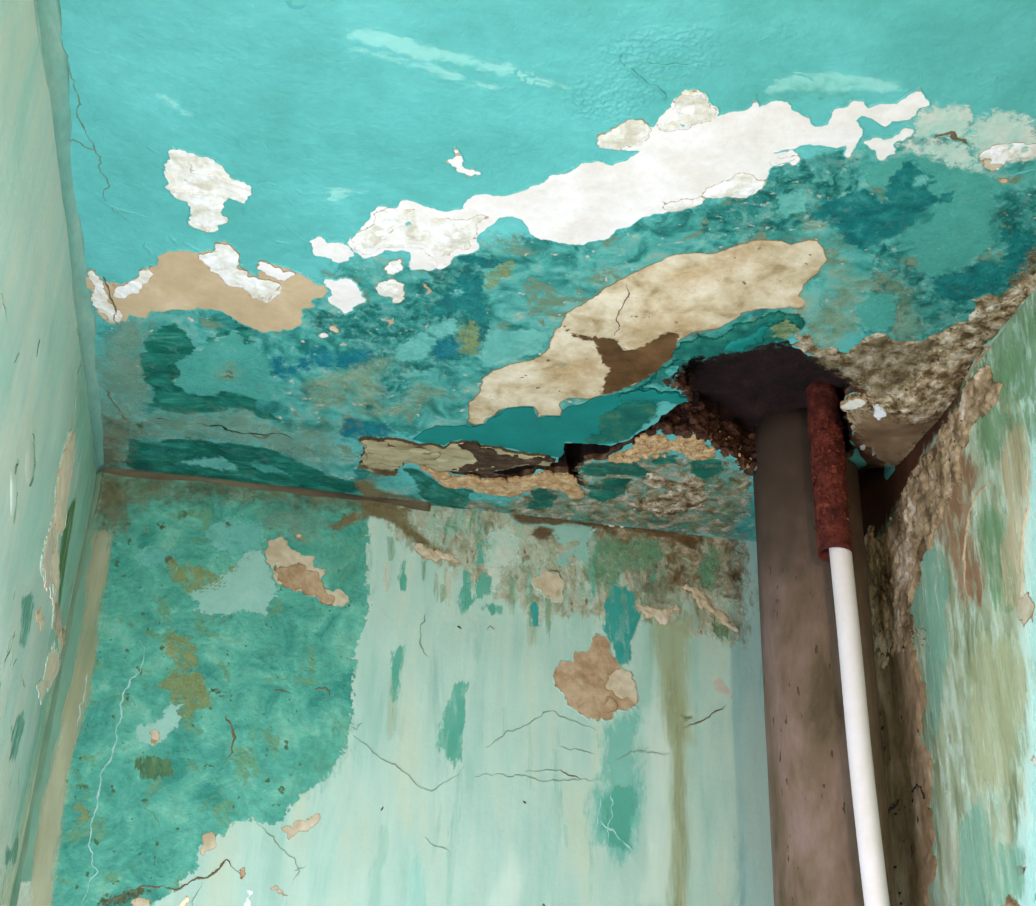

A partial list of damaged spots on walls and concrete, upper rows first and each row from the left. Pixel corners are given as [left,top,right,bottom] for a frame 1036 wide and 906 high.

peeling [85,86,1036,338]
peeling [467,239,828,425]
damp [59,500,76,606]
spalling [357,436,584,499]
damp [93,122,1036,906]
spalling [792,274,1036,906]
peeling [18,429,112,906]
crack [352,710,670,792]
peeling [551,633,640,723]
crack [679,705,726,728]
crack [97,859,238,906]
crack [256,823,305,880]